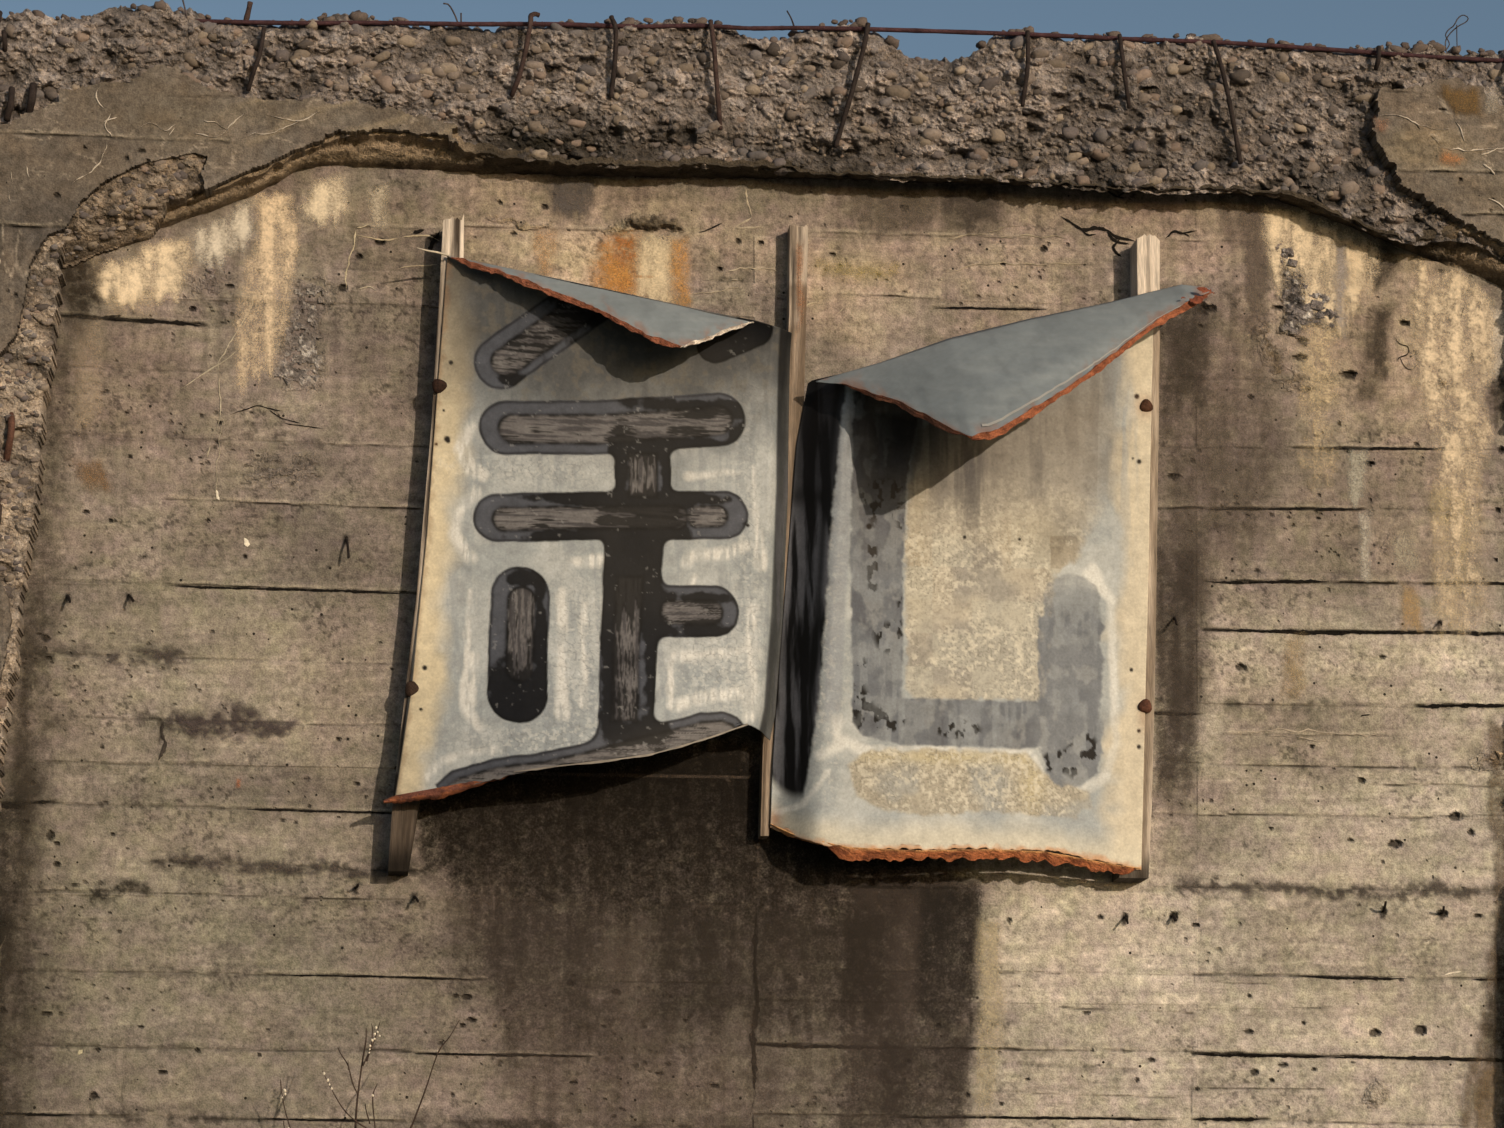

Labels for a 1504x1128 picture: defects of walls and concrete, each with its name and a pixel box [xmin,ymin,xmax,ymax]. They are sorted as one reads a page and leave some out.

spalling [0,0,1504,260]
spalling [0,154,207,813]
water stain [45,180,345,500]
peeling [181,257,231,295]
peeling [241,451,320,488]
peeling [269,274,342,392]
peeling [1249,241,1339,402]
water stain [0,519,55,1128]
water stain [419,729,1002,1128]
peeling [1468,746,1504,775]